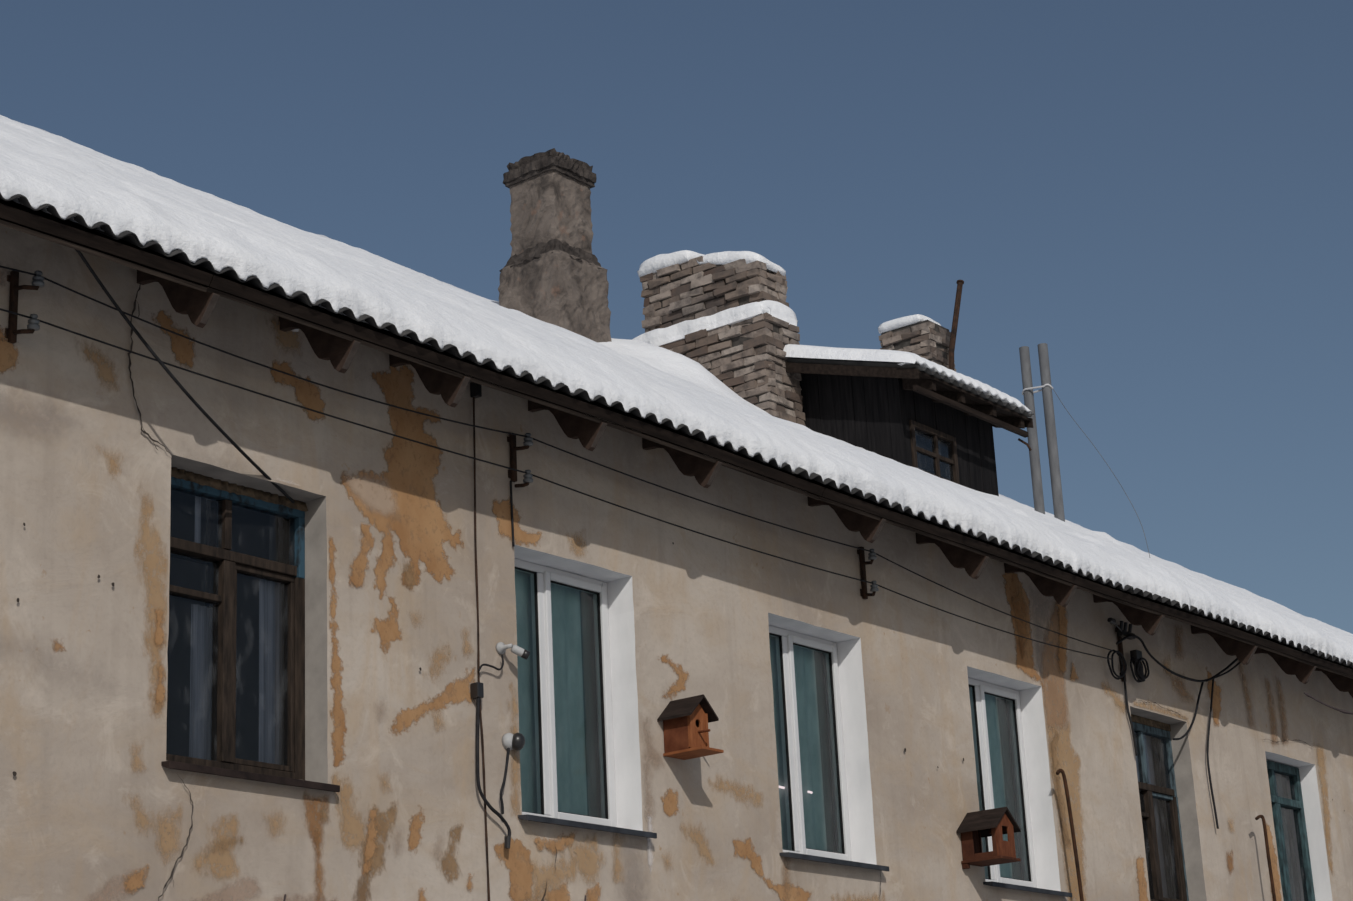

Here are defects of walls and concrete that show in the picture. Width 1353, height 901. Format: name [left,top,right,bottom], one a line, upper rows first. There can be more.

peeling [0,329,18,373]
crack [128,284,173,457]
peeling [270,320,325,421]
peeling [492,499,542,546]
peeling [136,502,167,714]
peeling [329,365,475,850]
peeling [661,655,689,698]
peeling [1002,573,1086,901]
crack [158,778,193,901]
peeling [494,833,603,901]
peeling [733,837,811,901]